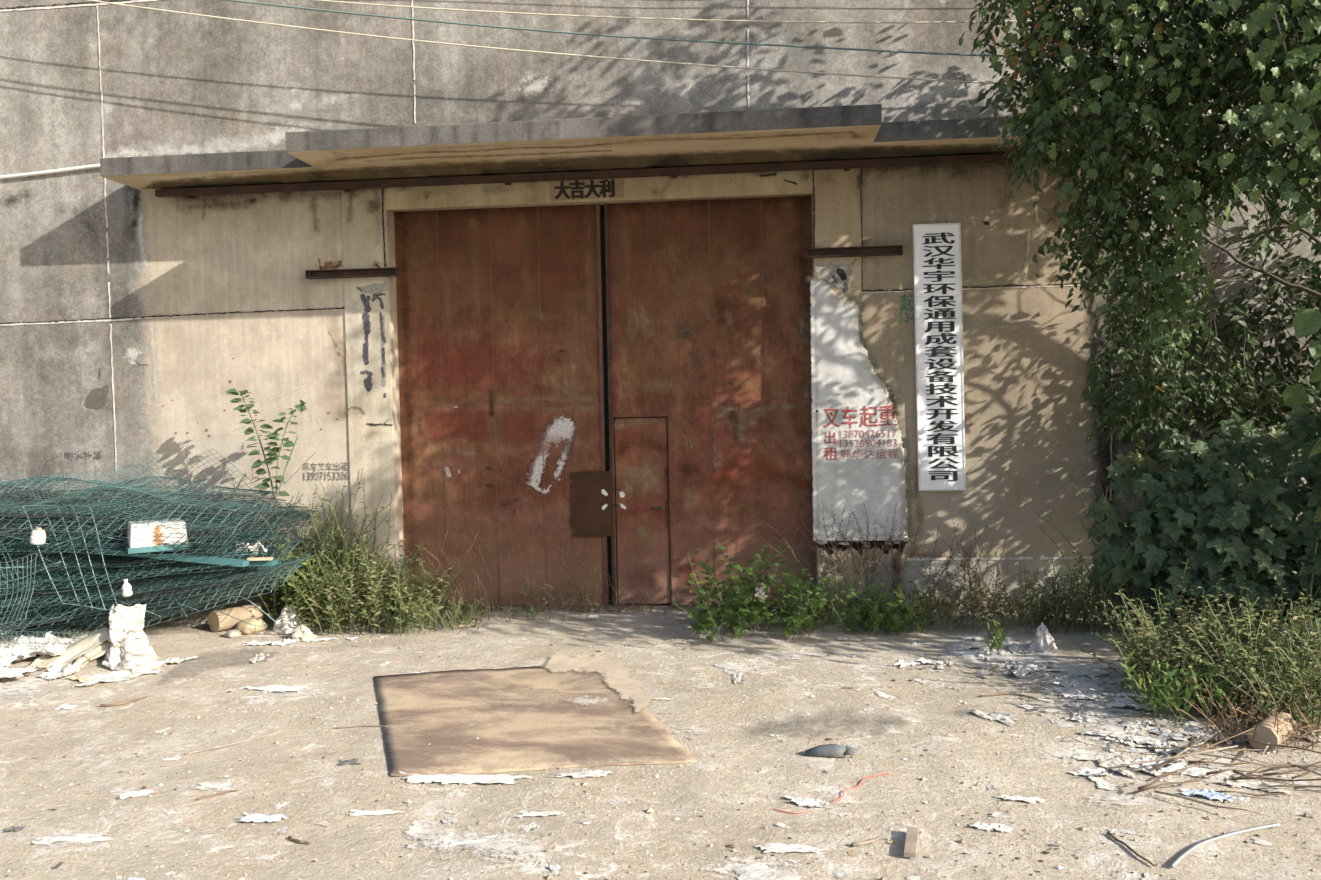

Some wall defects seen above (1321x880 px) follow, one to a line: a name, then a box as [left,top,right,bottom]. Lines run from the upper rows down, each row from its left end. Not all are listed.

damp [127,132,1019,300]
spalling [815,259,856,292]